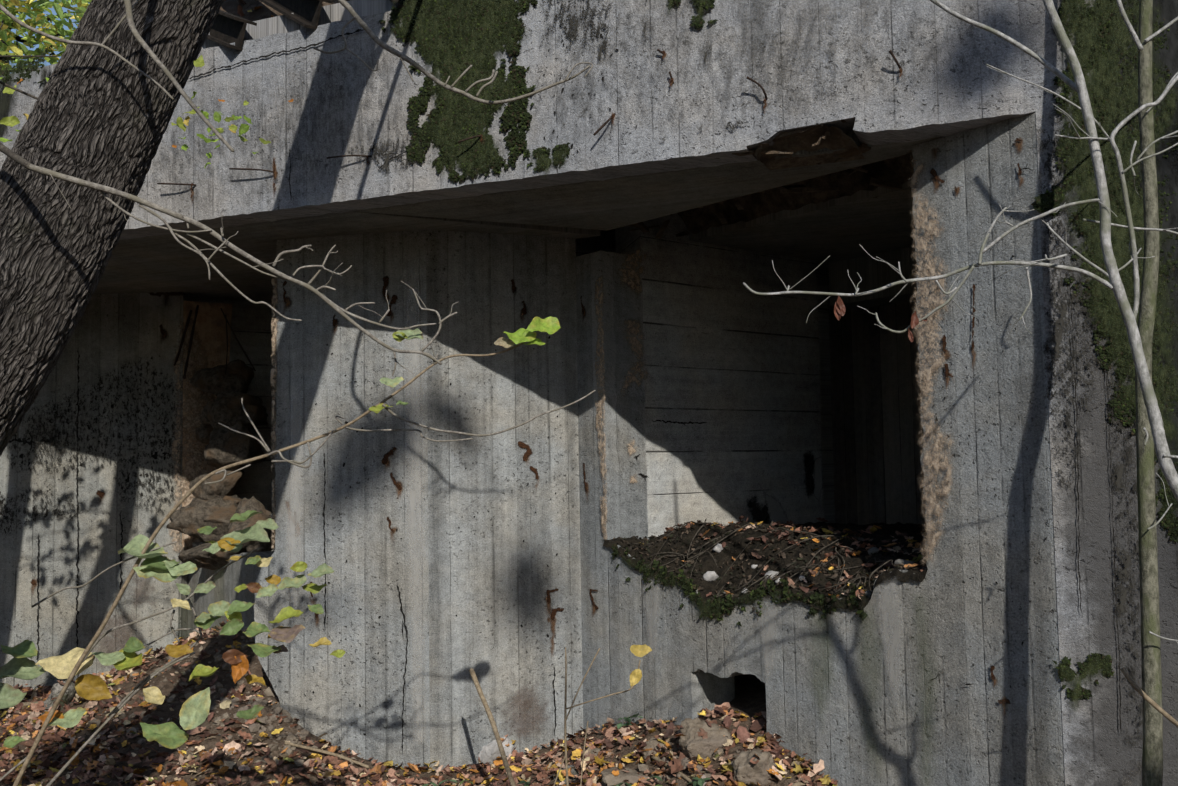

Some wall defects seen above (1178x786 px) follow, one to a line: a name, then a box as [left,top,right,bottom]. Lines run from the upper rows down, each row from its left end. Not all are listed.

spalling [732,119,871,170]
rust [930,148,960,194]
rust [1014,138,1023,186]
spalling [910,159,970,562]
rust [382,447,402,497]
rust [518,441,539,487]
rust [545,589,564,652]
crack [397,582,408,754]